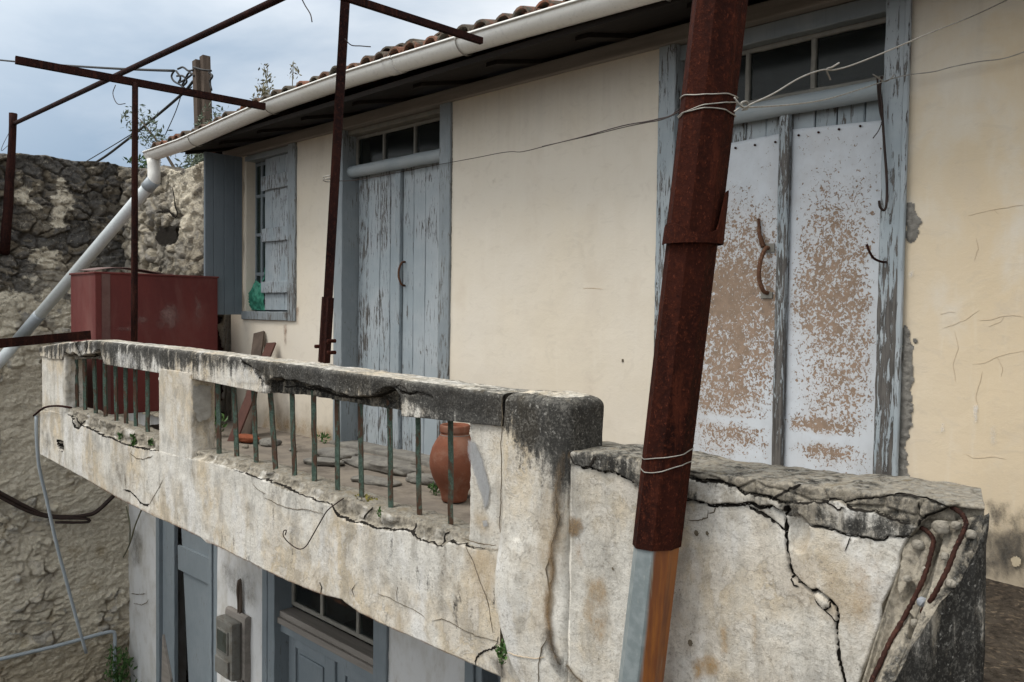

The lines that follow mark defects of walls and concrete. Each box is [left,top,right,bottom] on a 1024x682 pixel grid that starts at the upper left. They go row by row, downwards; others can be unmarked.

spalling [906,202,922,243]
spalling [69,415,159,451]
crack [240,358,274,387]
spalling [898,325,918,476]
crack [943,313,1021,405]
crack [123,480,163,506]
crack [379,396,582,682]
crack [687,477,949,682]
spalling [869,506,977,682]